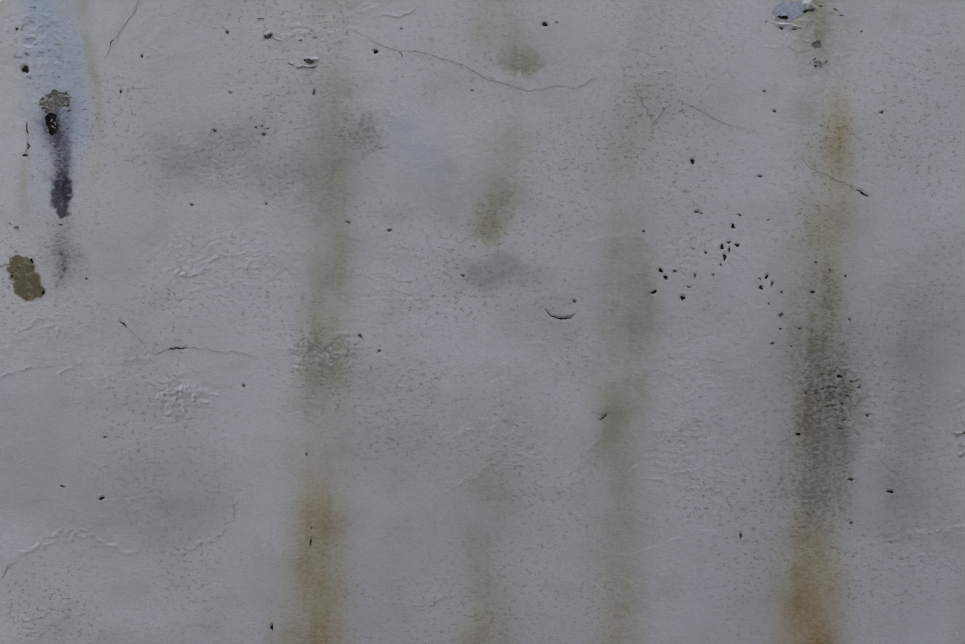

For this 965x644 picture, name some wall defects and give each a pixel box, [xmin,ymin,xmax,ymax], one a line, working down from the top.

peeling [765,0,844,30]
spalling [13,20,66,80]
spalling [812,40,828,68]
spalling [39,76,72,136]
water stain [44,120,72,218]
peeling [7,255,58,300]